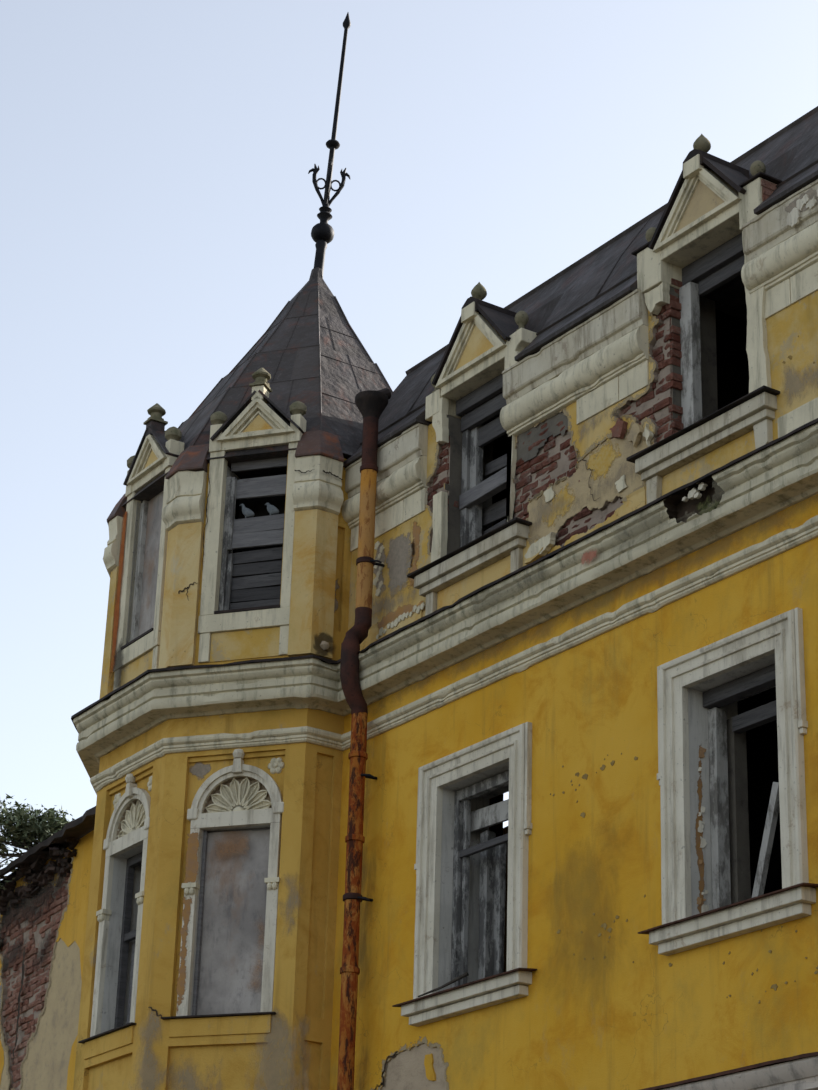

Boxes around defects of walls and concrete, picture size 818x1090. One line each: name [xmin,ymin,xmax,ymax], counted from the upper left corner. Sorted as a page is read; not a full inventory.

flaking render [761,179,777,201]
peeling [785,188,818,228]
peeling [512,278,684,564]
crack [178,475,210,598]
peeling [373,436,458,639]
peeling [682,482,708,502]
peeling [695,745,709,913]
flaking render [0,845,82,1090]
peeling [371,1036,449,1090]